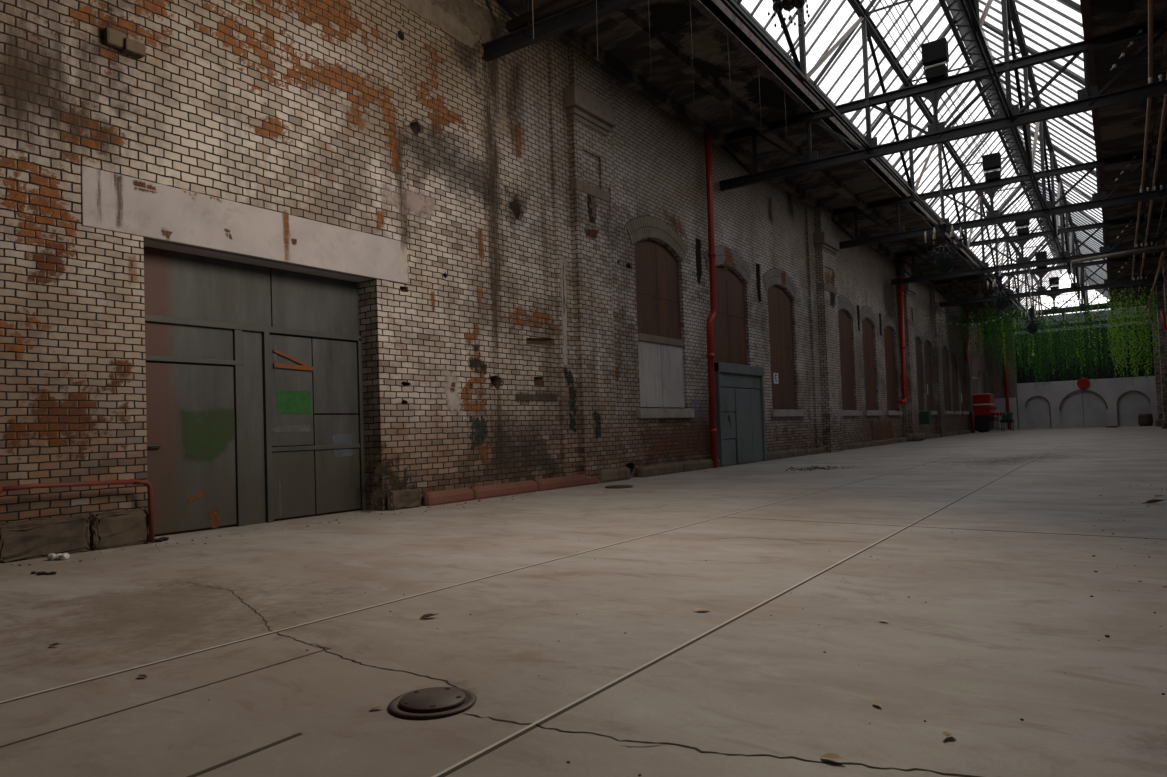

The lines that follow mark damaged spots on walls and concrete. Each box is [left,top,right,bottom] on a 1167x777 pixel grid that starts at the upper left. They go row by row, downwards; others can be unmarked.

spalling [21,0,467,173]
spalling [0,101,132,284]
water stain [477,58,524,351]
spalling [3,369,129,460]
spalling [488,375,504,388]
spalling [526,338,554,346]
crack [194,583,981,777]